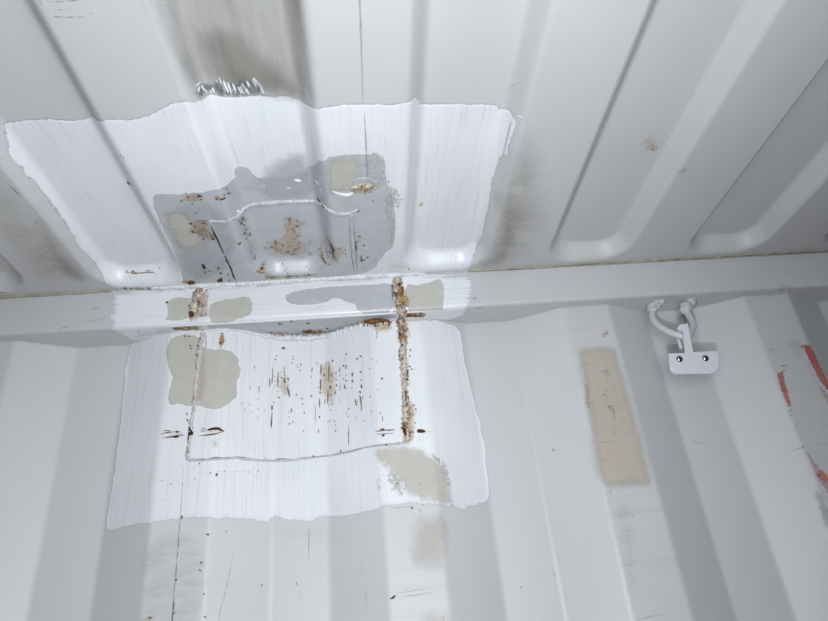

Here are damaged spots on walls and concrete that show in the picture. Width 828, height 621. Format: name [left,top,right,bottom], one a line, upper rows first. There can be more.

rust [238,217,346,279]
rust [173,326,198,356]
rust [341,318,392,329]
rust [397,286,430,336]
rust [259,347,383,444]